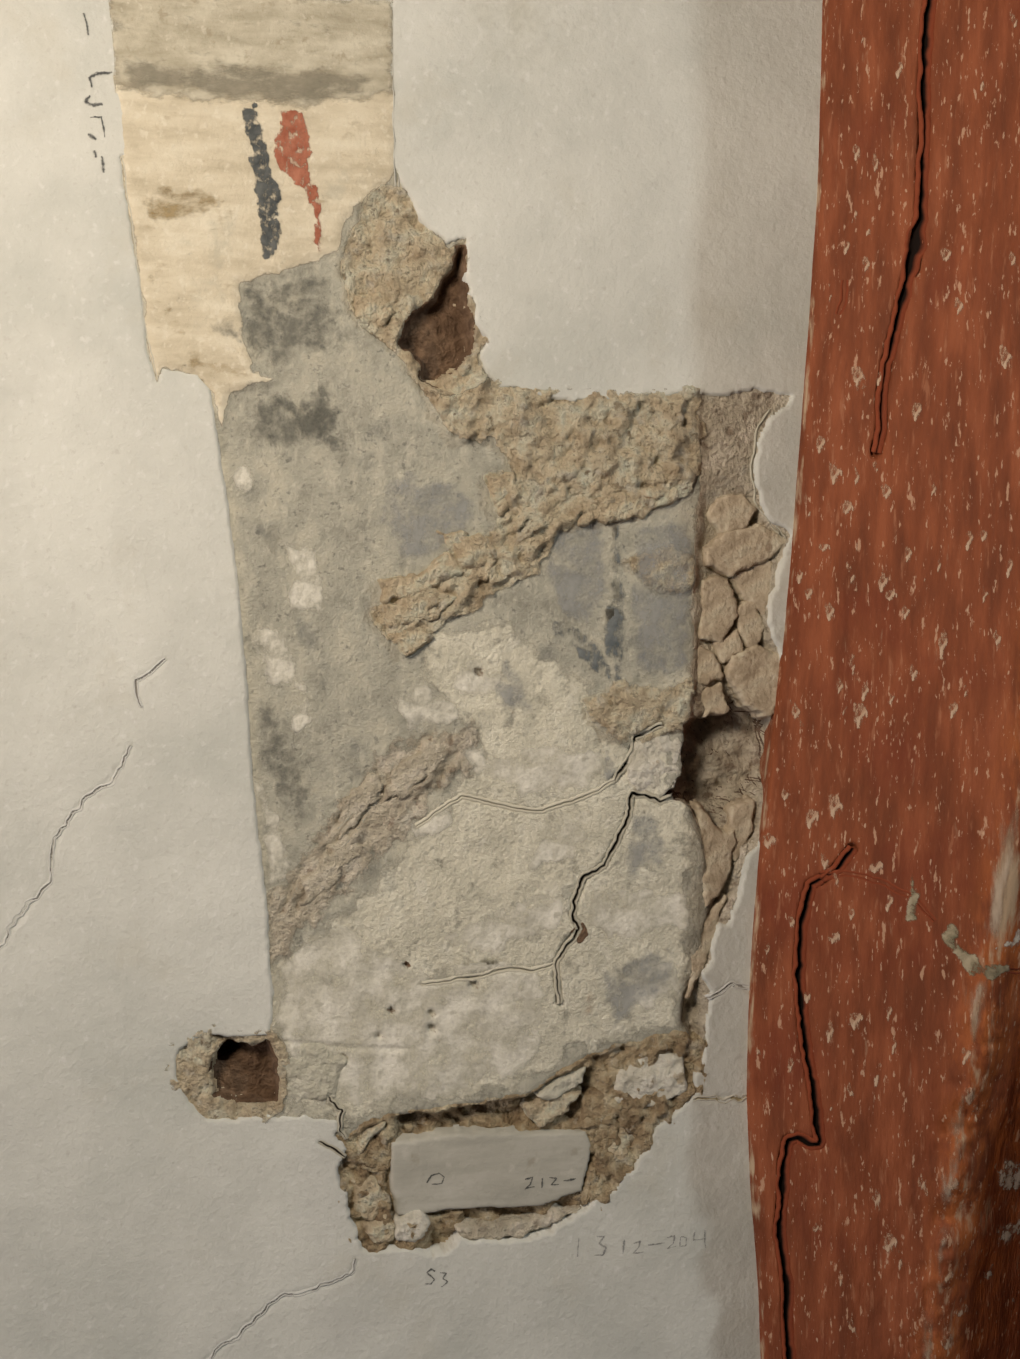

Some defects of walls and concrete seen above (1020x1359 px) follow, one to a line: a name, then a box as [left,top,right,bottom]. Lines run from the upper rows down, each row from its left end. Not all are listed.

crack [871,0,937,454]
peeling [851,367,881,387]
peeling [878,574,910,620]
flaking render [109,0,801,1253]
crack [133,657,167,707]
peeling [843,685,869,728]
peeling [806,794,843,829]
crack [0,745,133,950]
crack [414,722,674,1004]
crack [704,980,750,1000]
peeling [850,1013,863,1030]
crack [773,845,937,1359]